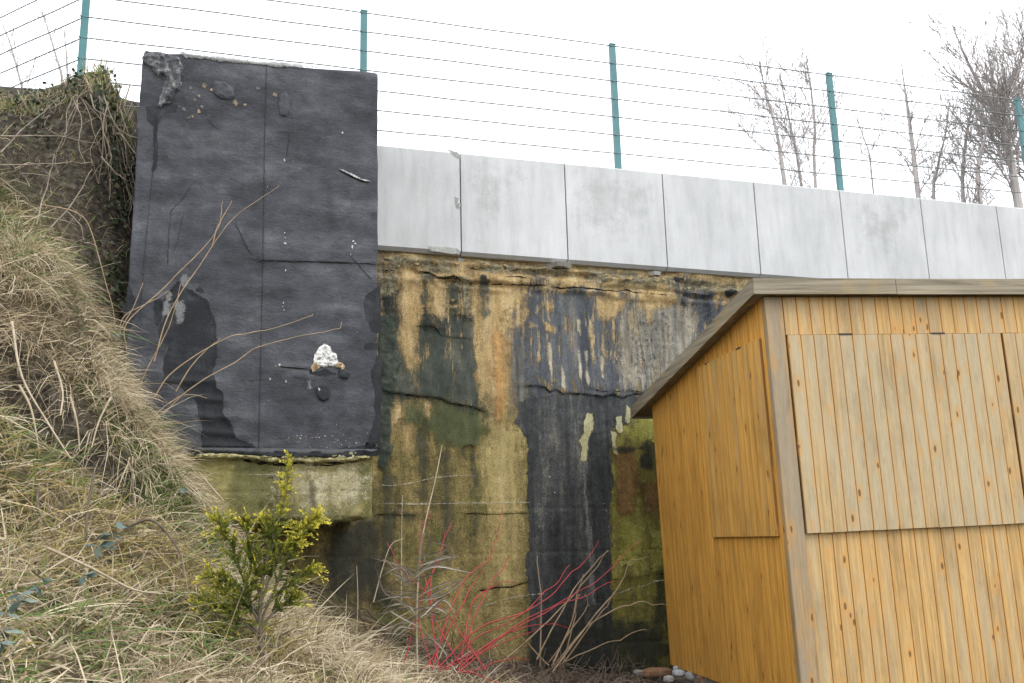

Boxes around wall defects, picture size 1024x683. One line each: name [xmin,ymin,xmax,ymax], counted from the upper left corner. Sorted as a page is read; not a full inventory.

peeling [146,51,323,171]
crack [236,225,719,297]
water stain [415,422,429,504]
crack [395,393,484,412]
water stain [421,266,731,606]
crack [529,385,640,399]